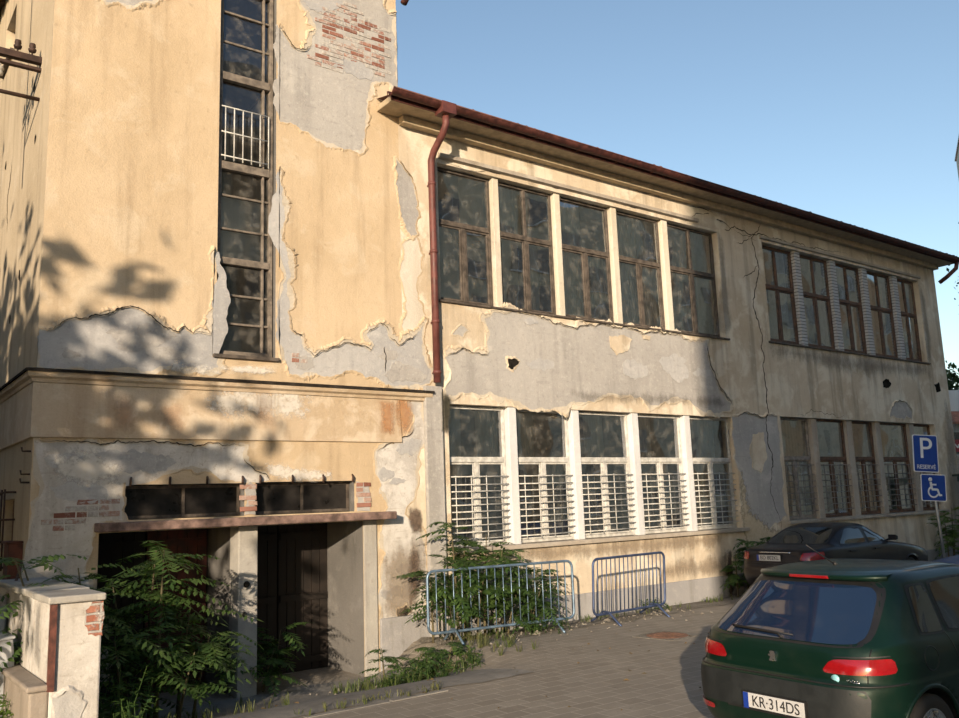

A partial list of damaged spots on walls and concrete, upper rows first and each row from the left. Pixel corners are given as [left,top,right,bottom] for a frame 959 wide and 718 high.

spalling [96,0,169,12]
spalling [273,0,398,157]
spalling [37,245,271,378]
spalling [268,155,788,626]
crack [726,226,839,518]
spalling [21,437,271,590]
spalling [84,601,108,636]
spalling [50,685,88,718]